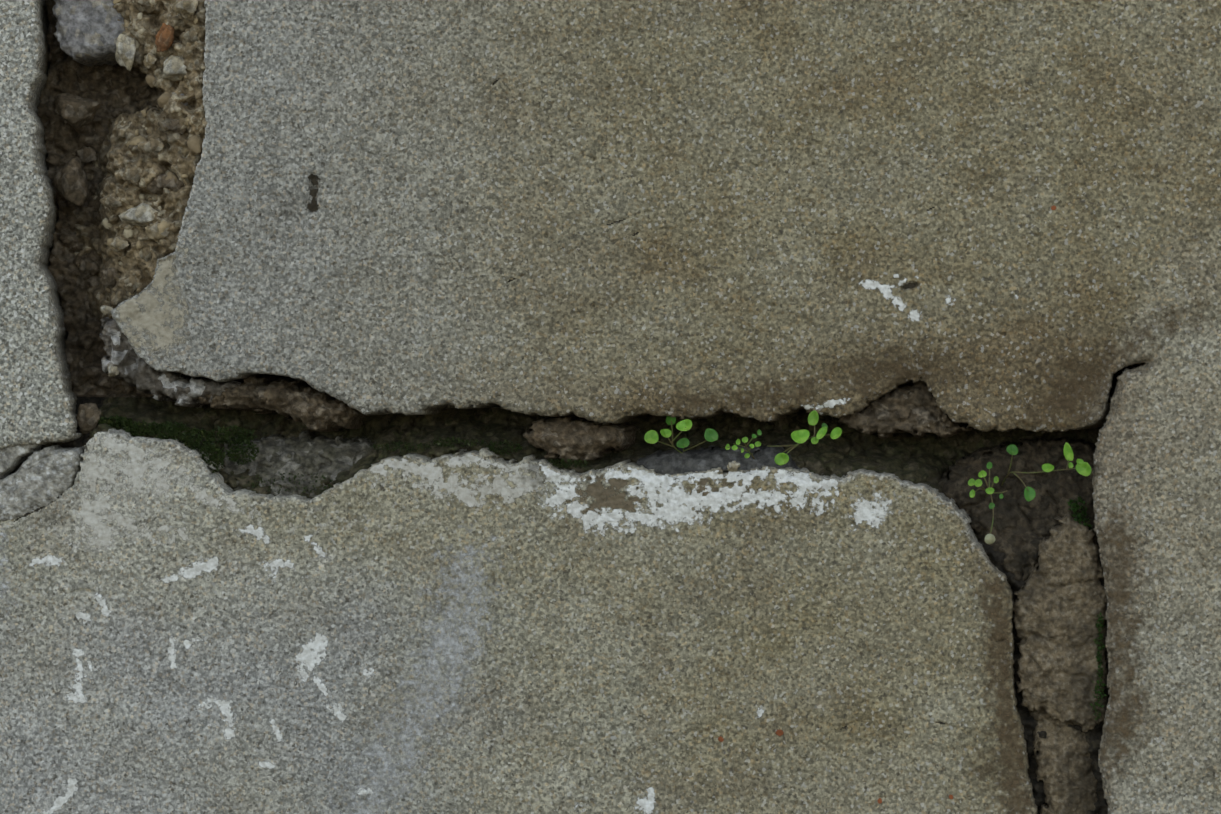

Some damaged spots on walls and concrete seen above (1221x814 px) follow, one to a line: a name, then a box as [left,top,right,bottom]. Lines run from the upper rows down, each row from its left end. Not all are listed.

spalling [72,0,244,408]
crack [9,0,1102,499]
spalling [838,381,974,439]
crack [14,497,59,522]
leakage [365,454,839,536]
spalling [566,473,643,514]
spalling [686,478,728,496]
leakage [849,492,893,531]
crack [973,529,1109,814]